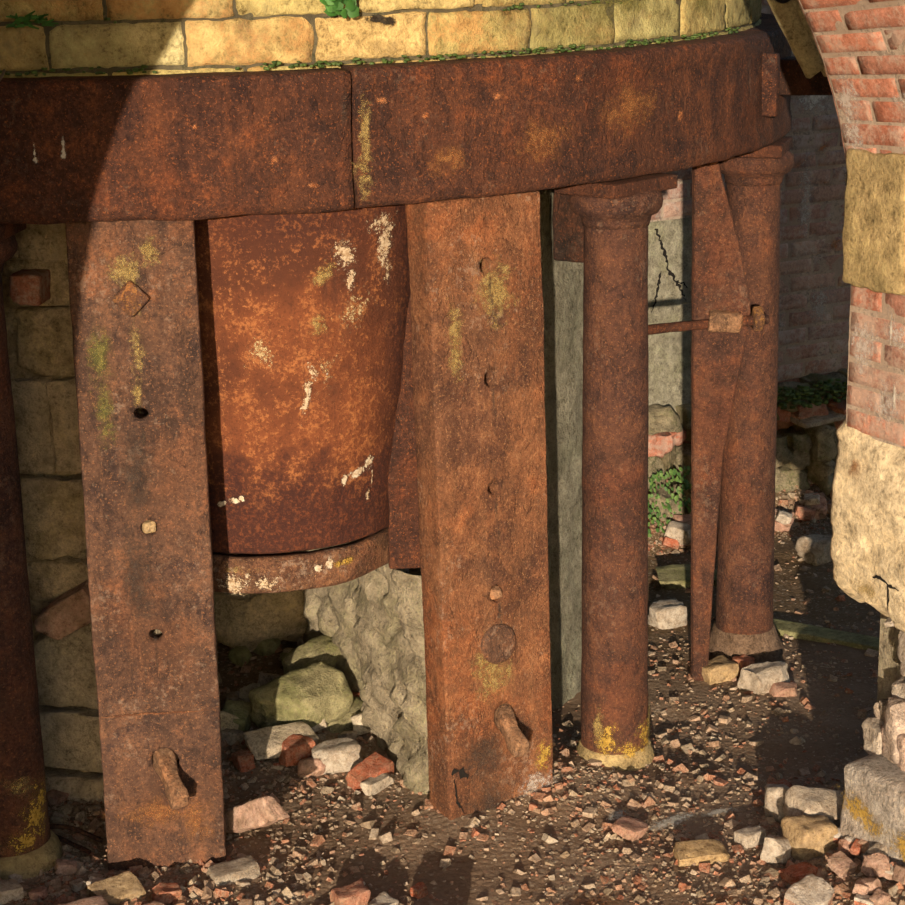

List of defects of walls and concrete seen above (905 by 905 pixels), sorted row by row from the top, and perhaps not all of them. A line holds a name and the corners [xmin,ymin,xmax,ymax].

rust [357,99,385,195]
rust [480,266,510,324]
crack [651,229,688,312]
rust [449,310,462,373]
crack [872,575,899,611]
rust [474,653,512,693]